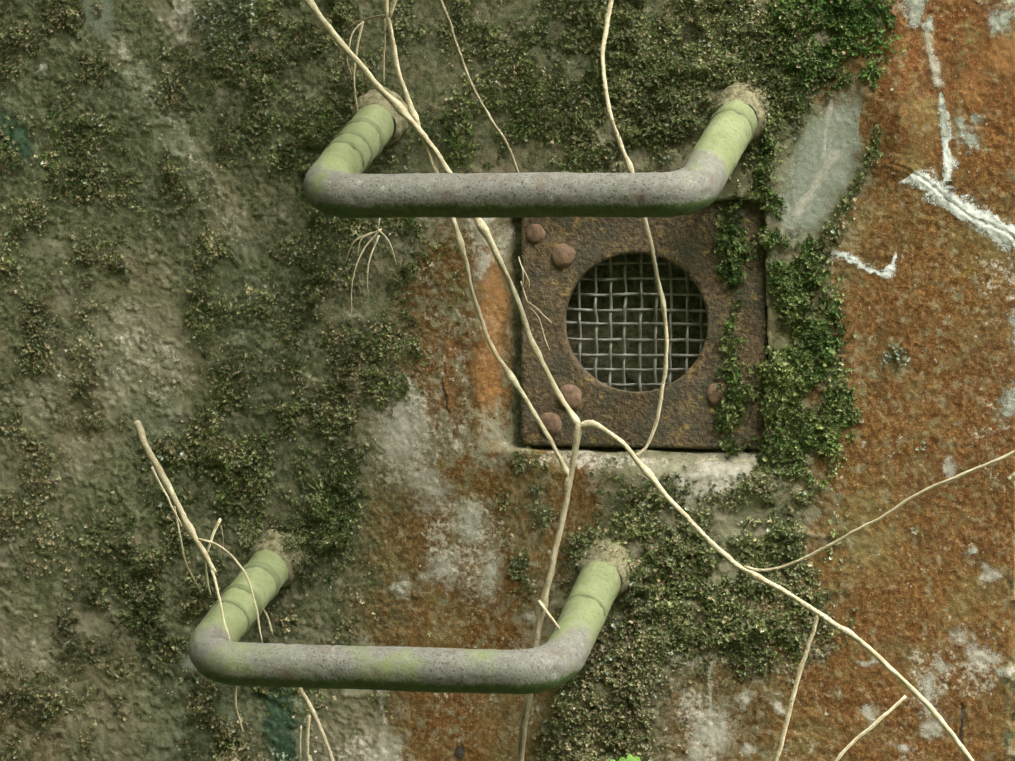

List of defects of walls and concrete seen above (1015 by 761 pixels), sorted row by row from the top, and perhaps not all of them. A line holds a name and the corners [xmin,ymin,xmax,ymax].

crack [901,111,1015,251]
rust [471,260,507,409]